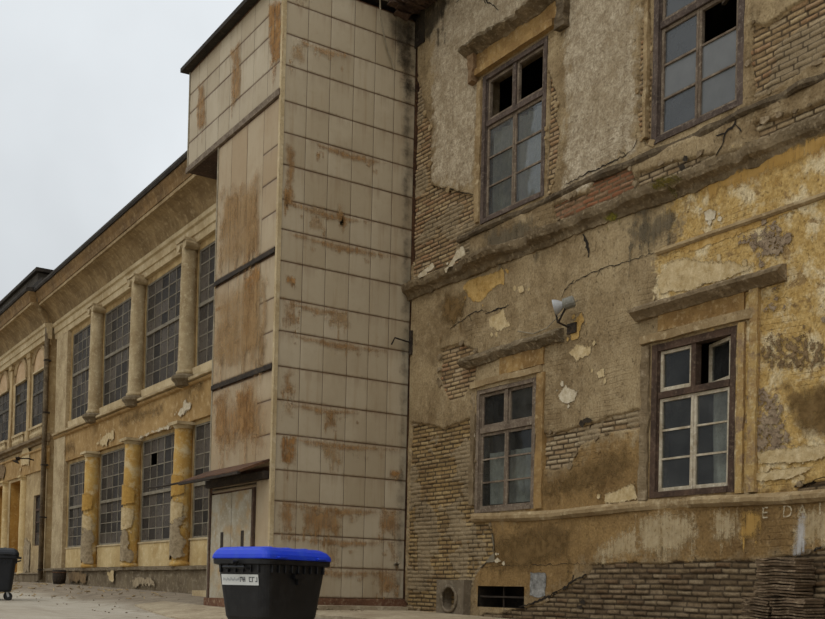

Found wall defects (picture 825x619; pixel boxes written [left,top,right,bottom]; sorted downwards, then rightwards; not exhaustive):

corrosion [269,2,283,73]
spalling [744,0,825,99]
spalling [413,78,480,279]
crack [565,139,637,185]
crack [716,120,741,155]
crack [561,234,653,298]
crack [450,305,507,329]
spalling [761,325,825,371]
peeling [556,381,578,408]
peeling [756,387,825,491]
water stain [786,384,825,433]
spalling [169,498,186,560]